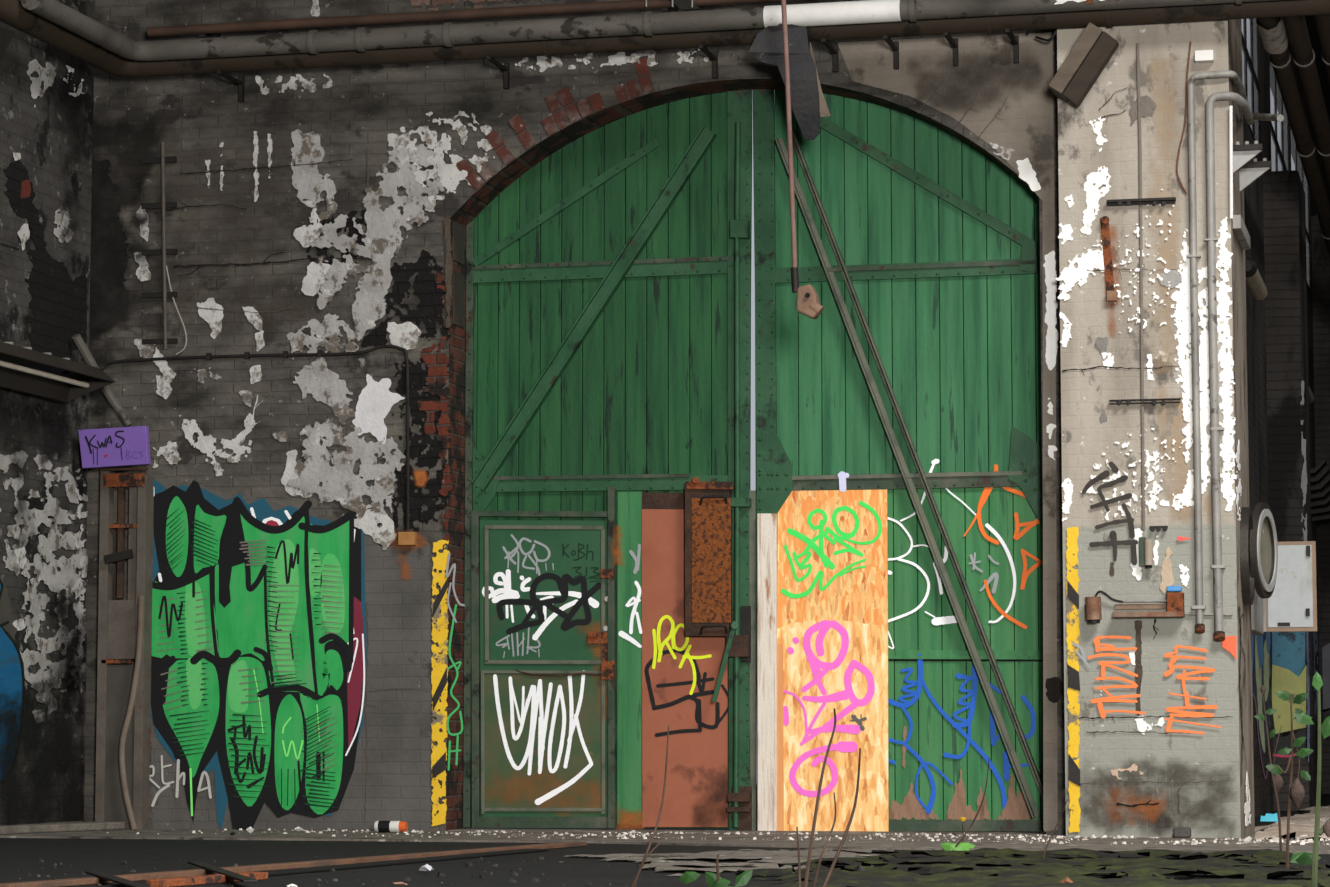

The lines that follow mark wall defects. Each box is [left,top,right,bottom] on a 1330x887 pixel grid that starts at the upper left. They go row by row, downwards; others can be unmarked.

peeling [134,306,265,476]
peeling [197,298,224,339]
peeling [273,49,709,550]
peeling [1043,116,1242,521]
peeling [0,450,88,718]
spalling [1130,528,1190,594]